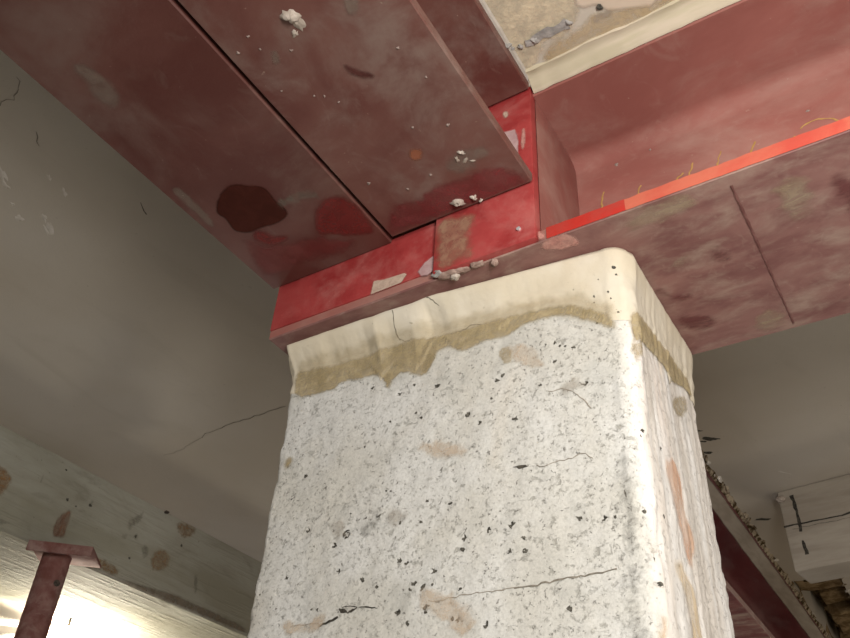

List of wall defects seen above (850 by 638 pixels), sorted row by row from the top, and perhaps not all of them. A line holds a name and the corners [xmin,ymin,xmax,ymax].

damp [217,185,287,233]
damp [295,305,613,397]
crack [515,453,592,469]
spalling [701,448,850,638]
crack [784,495,850,555]
crack [428,568,617,602]